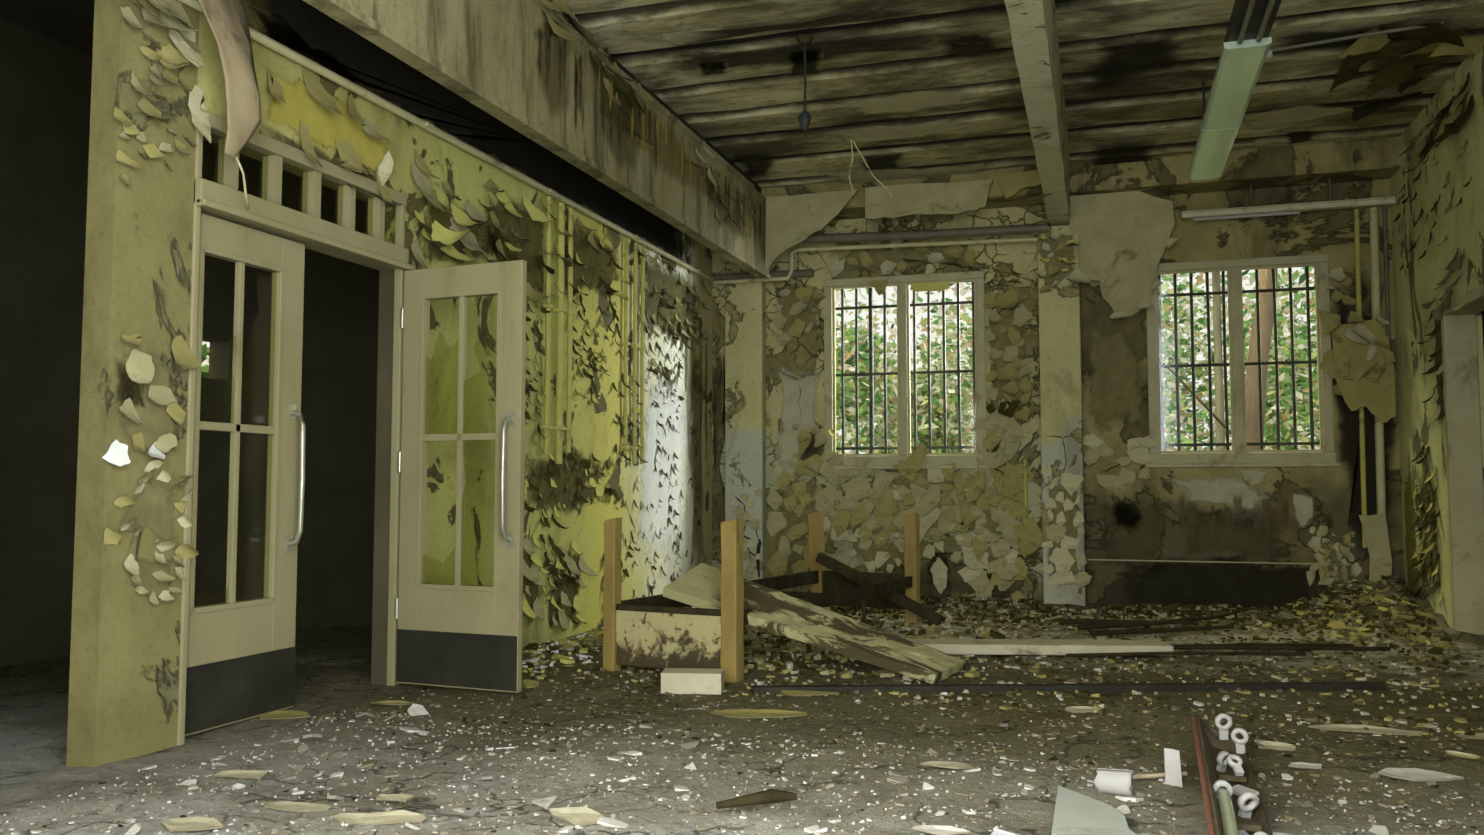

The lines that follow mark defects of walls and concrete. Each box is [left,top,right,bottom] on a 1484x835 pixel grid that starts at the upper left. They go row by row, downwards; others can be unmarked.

leakage [679,12,994,75]
leakage [1093,35,1179,89]
leakage [1282,22,1402,52]
leakage [244,0,689,263]
leakage [862,154,902,170]
leakage [1091,142,1154,166]
peeling [1243,23,1484,424]
peeling [829,239,976,295]
peeling [267,66,712,630]
peeling [101,334,200,606]
flaking render [729,290,1268,600]
flaking render [1293,494,1313,527]